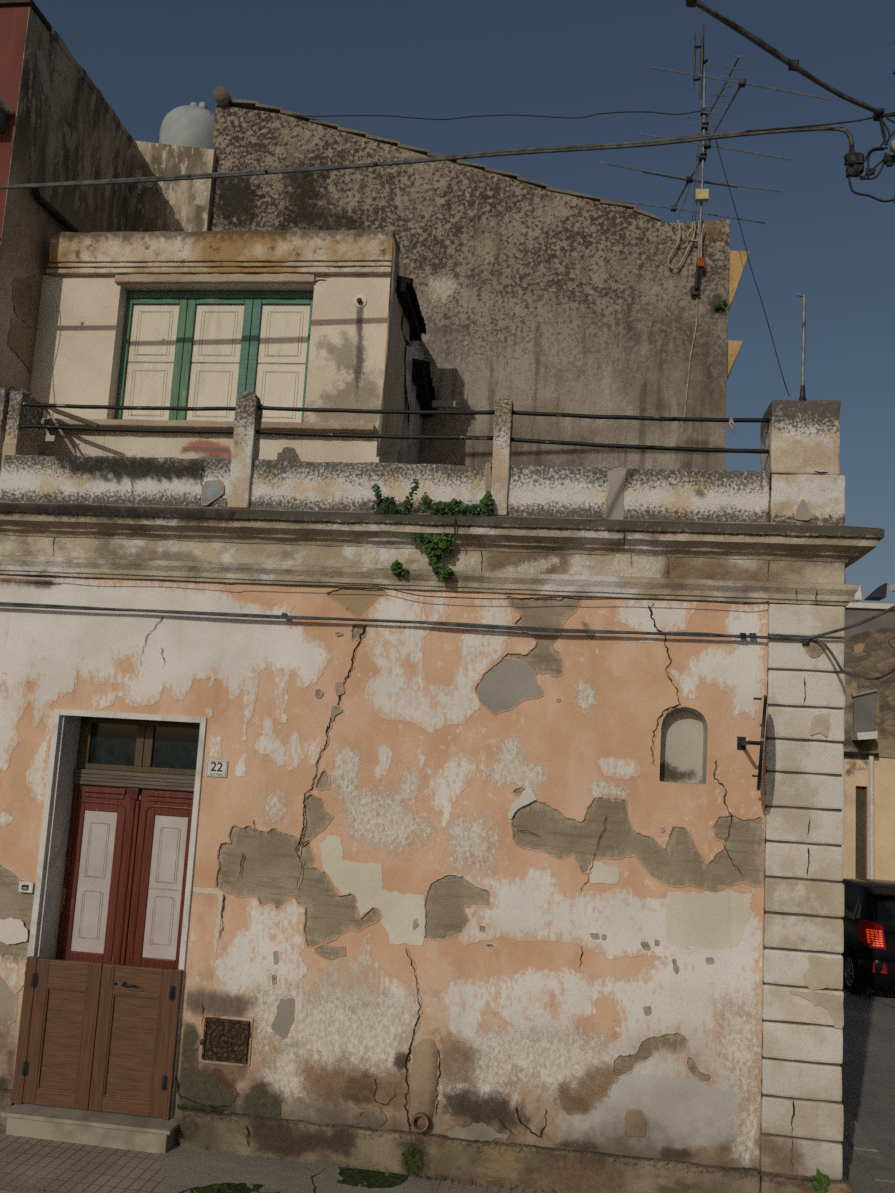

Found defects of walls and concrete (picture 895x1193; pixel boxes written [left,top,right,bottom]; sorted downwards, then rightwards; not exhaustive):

water stain [281,164,364,231]
water stain [355,308,363,386]
water stain [56,440,231,483]
crack [648,603,681,765]
crack [295,624,368,889]
peeling [0,575,768,1164]
water stain [185,992,247,1017]
water stain [175,1024,353,1156]
water stain [393,1053,407,1069]
crack [374,947,441,1131]
water stain [443,1089,528,1129]
water stain [558,1083,589,1113]